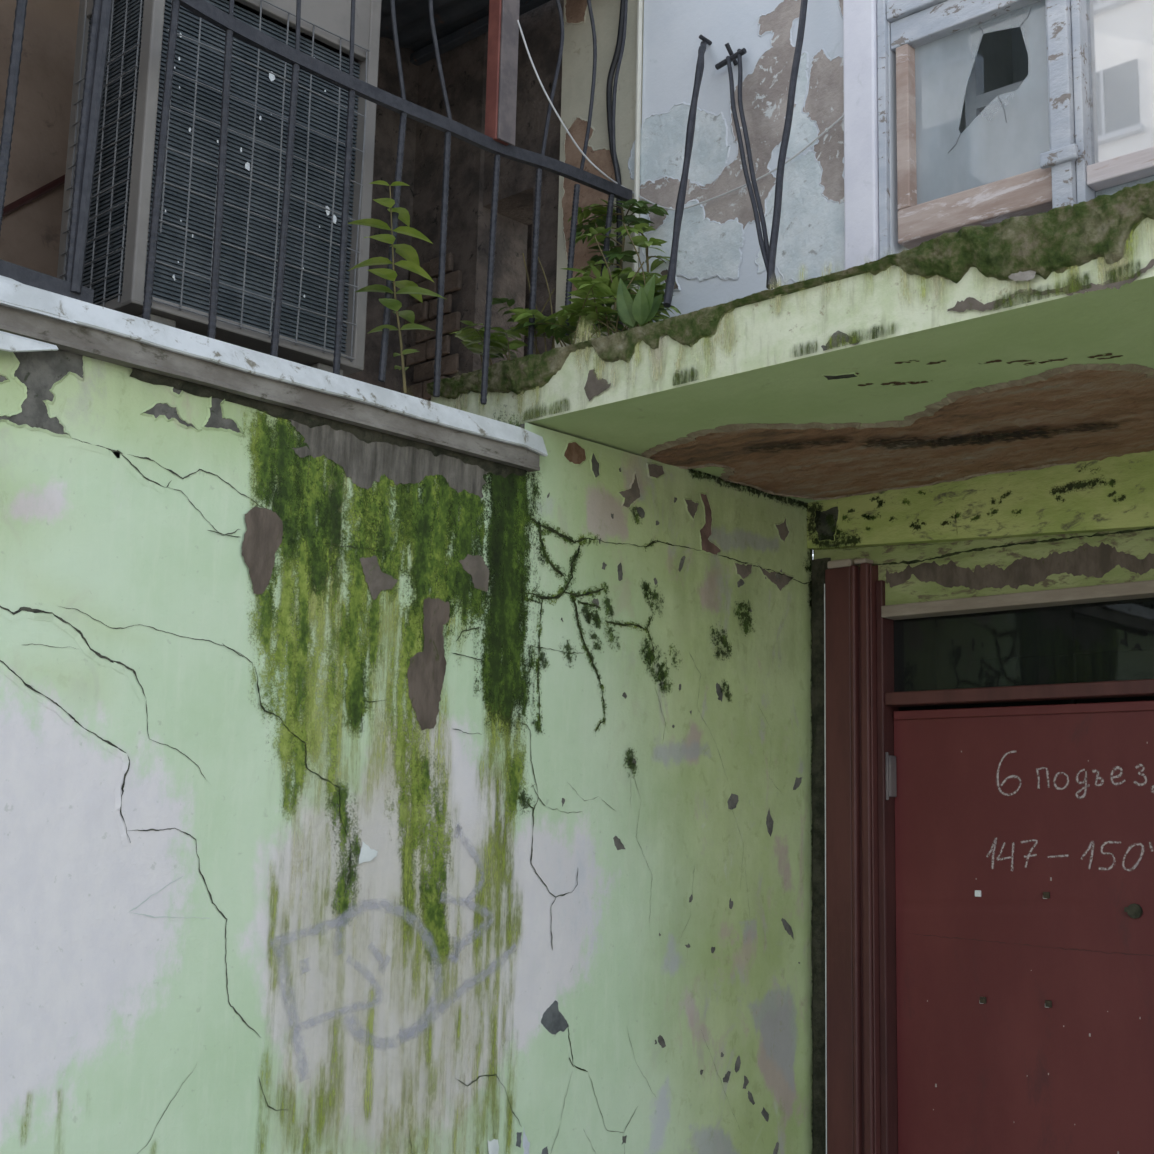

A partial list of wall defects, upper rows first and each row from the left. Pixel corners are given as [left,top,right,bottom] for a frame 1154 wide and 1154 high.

peeling [561,0,845,291]
spalling [0,349,86,439]
crack [72,438,264,538]
spalling [610,363,1154,544]
spalling [242,506,283,594]
damp [581,597,620,653]
damp [640,580,665,613]
damp [639,635,681,697]
damp [624,748,638,779]
crack [516,518,810,950]
crack [0,606,351,1037]
crack [551,1029,655,1154]